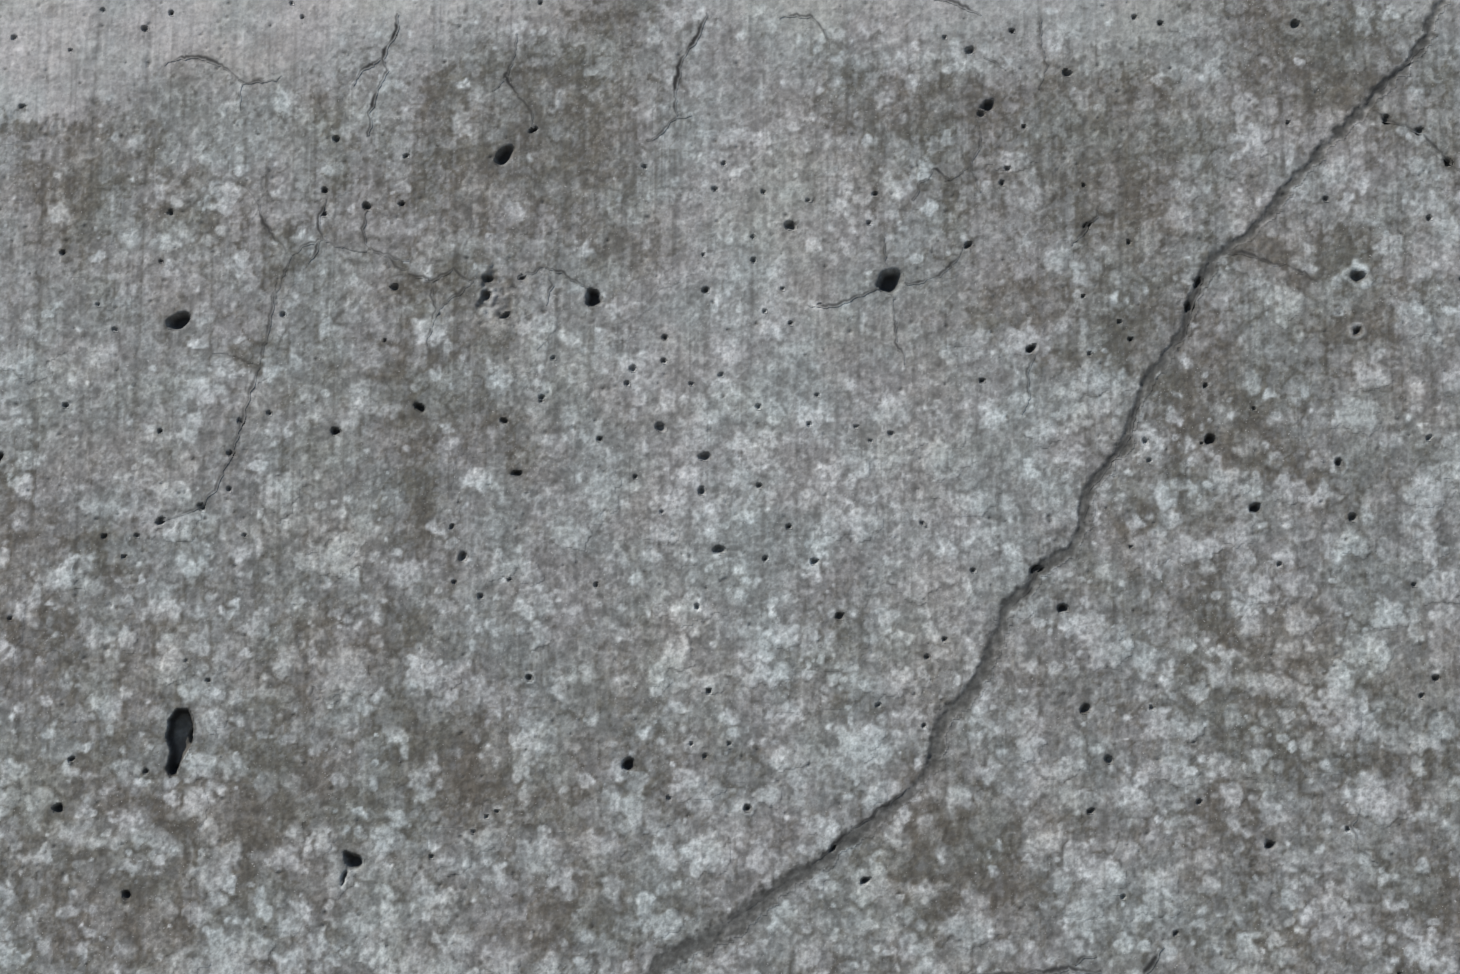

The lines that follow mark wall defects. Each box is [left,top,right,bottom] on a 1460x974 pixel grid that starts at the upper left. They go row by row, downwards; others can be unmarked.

water stain [0,0,776,974]
crack [643,0,1460,974]
water stain [791,0,1460,803]
water stain [1181,786,1294,867]